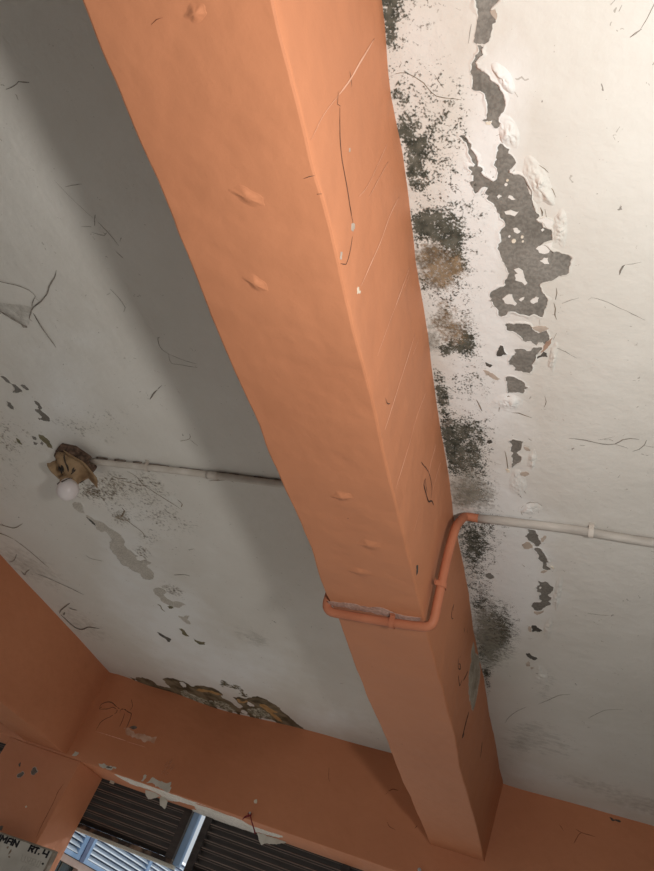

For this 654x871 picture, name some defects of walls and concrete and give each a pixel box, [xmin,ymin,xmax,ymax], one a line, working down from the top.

water stain [382,0,414,53]
peeling [468,0,510,129]
peeling [455,131,577,394]
water stain [389,61,519,693]
peeling [522,528,555,632]
peeling [99,763,283,838]